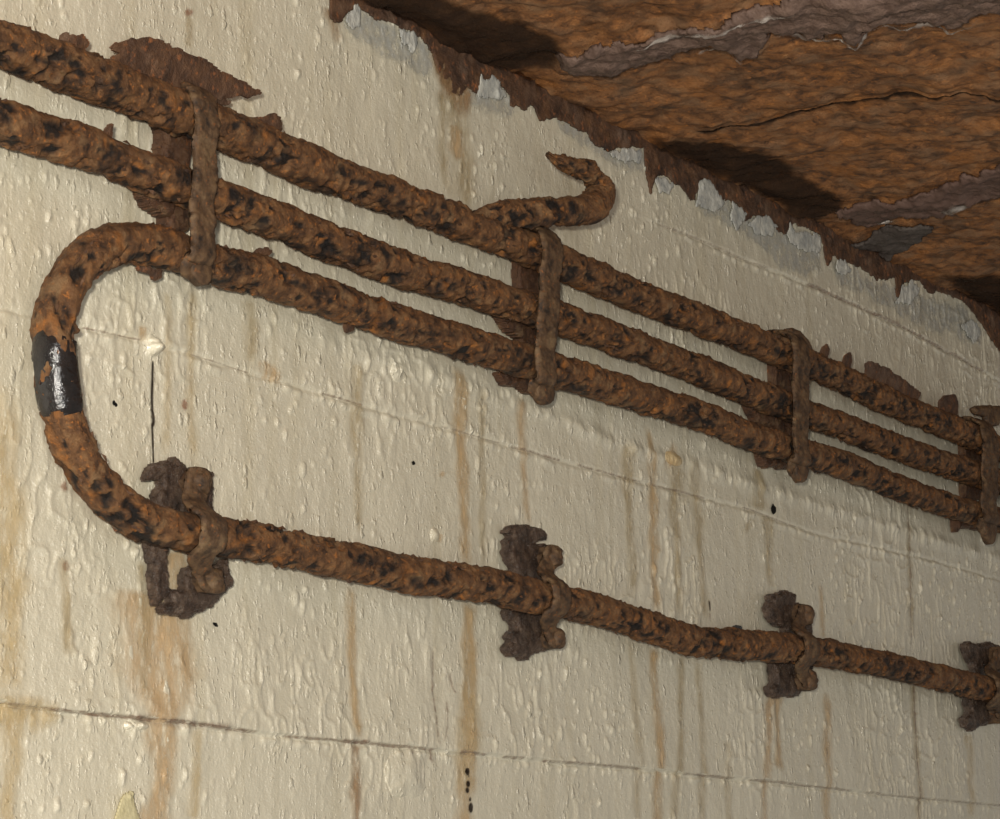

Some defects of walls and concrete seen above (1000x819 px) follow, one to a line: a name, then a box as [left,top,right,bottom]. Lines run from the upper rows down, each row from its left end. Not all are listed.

corrosion [59,32,90,49]
corrosion [109,37,262,106]
corrosion [255,113,283,131]
crack [699,91,1000,134]
peeling [329,0,1000,351]
corrosion [254,247,272,255]
corrosion [135,266,163,281]
corrosion [842,352,852,368]
corrosion [864,361,921,399]
corrosion [938,394,958,415]
corrosion [127,594,187,819]
corrosion [460,608,476,819]